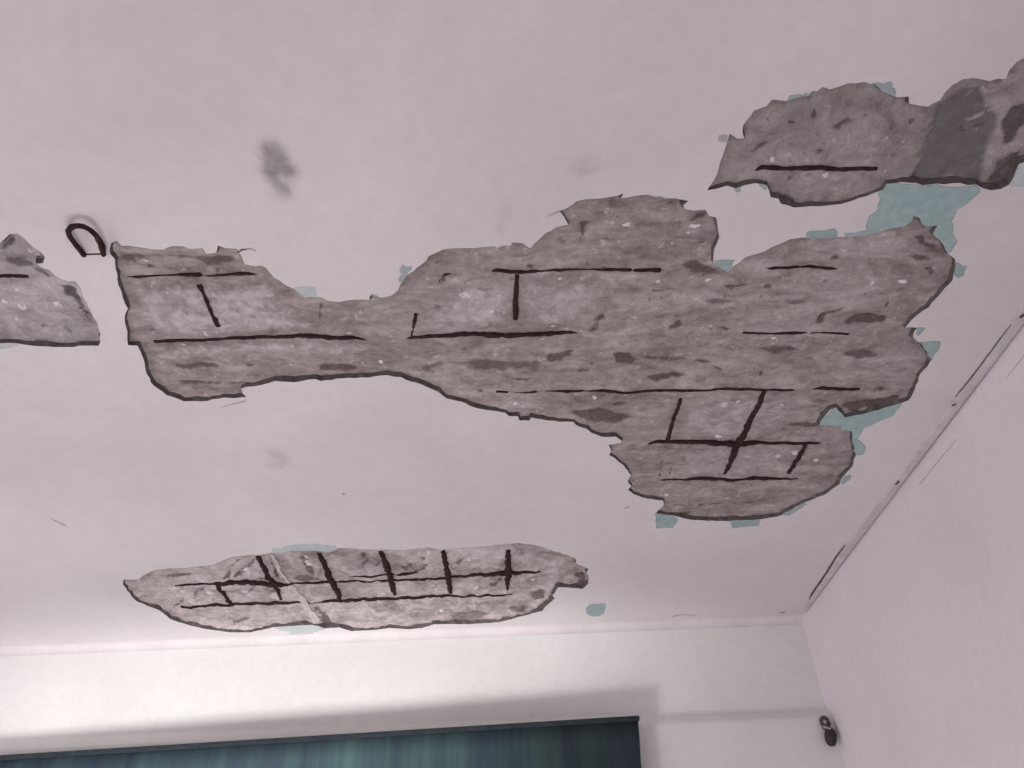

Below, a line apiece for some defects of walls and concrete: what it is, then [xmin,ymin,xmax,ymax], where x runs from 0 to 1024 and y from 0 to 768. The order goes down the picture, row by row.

spalling [0,234,100,349]
spalling [110,58,1024,528]
spalling [123,543,589,635]